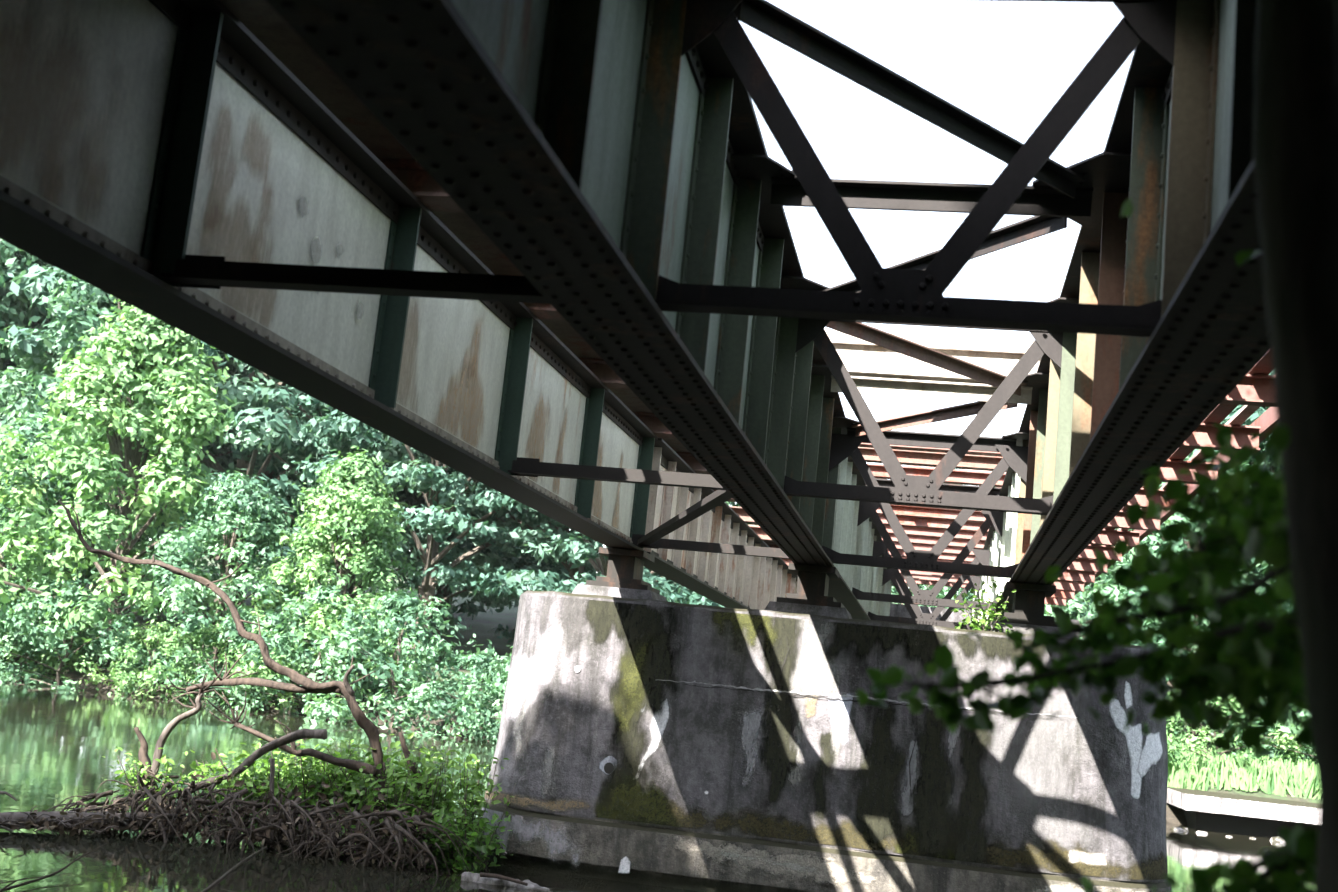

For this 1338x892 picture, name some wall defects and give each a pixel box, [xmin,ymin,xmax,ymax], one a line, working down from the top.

water stain [545,749,555,790]
water stain [506,597,629,772]
water stain [636,699,669,778]
water stain [742,711,762,783]
water stain [788,620,1045,819]
water stain [991,686,1094,846]